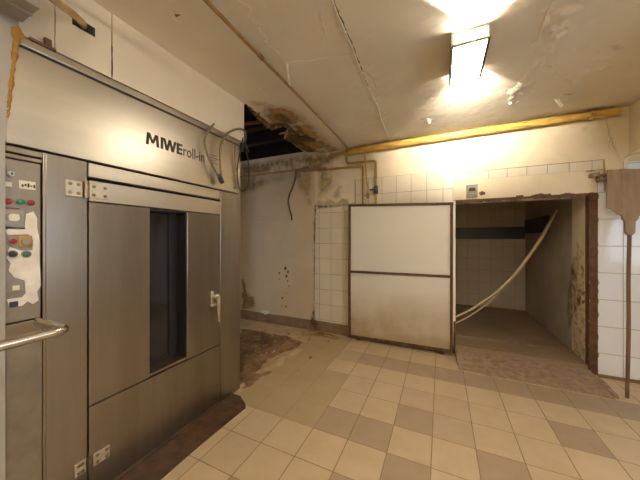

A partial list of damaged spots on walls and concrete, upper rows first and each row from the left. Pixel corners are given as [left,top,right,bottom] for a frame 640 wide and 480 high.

crack [327,0,392,142]
peeling [505,1,585,104]
damp [245,86,337,191]